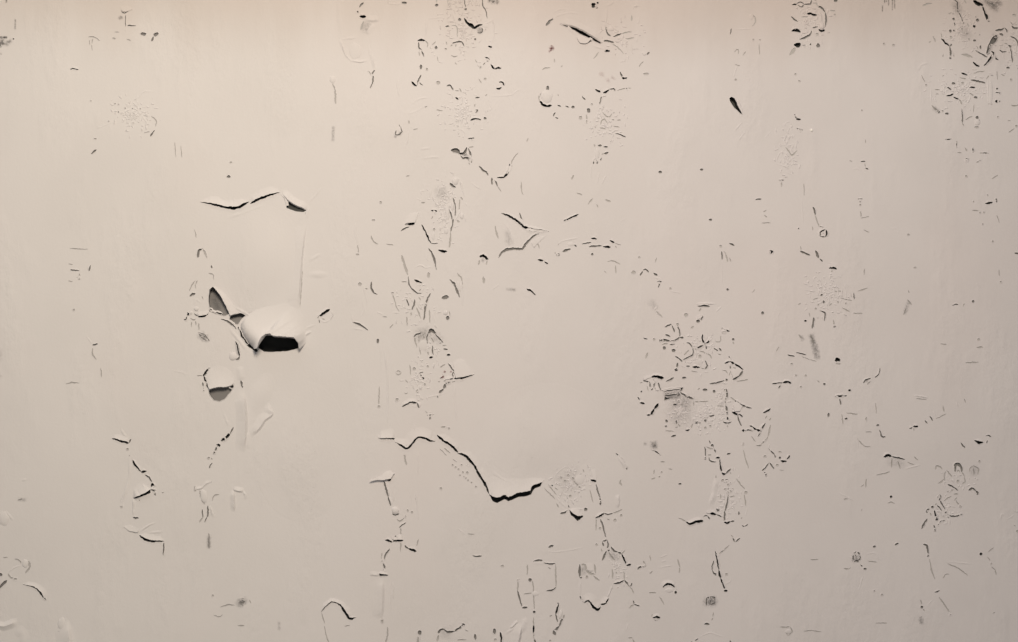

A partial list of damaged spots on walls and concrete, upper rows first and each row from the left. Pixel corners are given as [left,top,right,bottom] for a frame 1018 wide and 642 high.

spalling [789,0,838,55]
spalling [921,0,1018,115]
spalling [578,87,631,185]
peeling [184,280,312,361]
peeling [441,273,464,306]
spalling [643,302,721,353]
peeling [378,322,623,539]
spalling [637,373,717,438]
peeling [730,397,754,433]
spalling [757,439,791,477]
peeling [120,447,166,555]
crack [595,537,660,621]